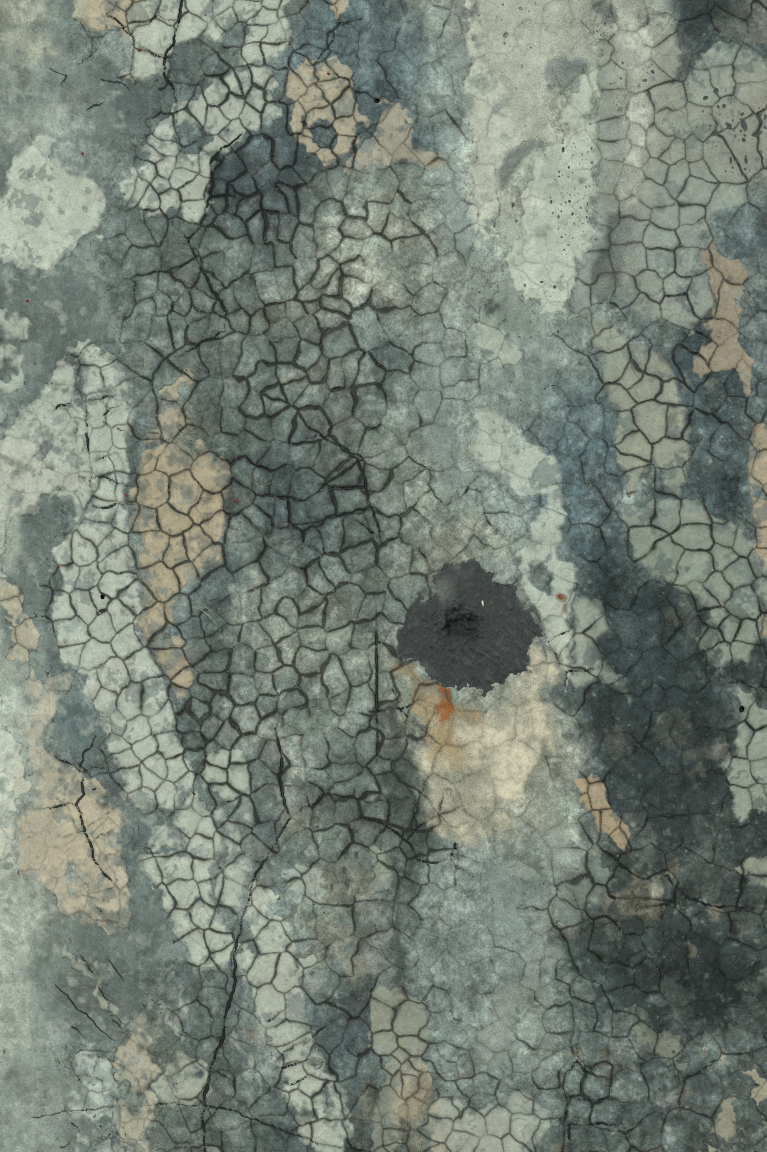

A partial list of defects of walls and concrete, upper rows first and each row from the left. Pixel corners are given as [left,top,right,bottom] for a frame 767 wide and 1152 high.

crack [50,52,130,110]
crack [108,0,184,123]
crack [310,19,361,66]
crack [172,134,244,357]
crack [53,395,133,509]
crack [291,435,383,546]
crack [548,622,591,690]
crack [369,689,434,742]
rust [409,664,480,759]
crack [30,729,473,1152]
crack [630,874,747,959]
crack [539,1044,627,1152]